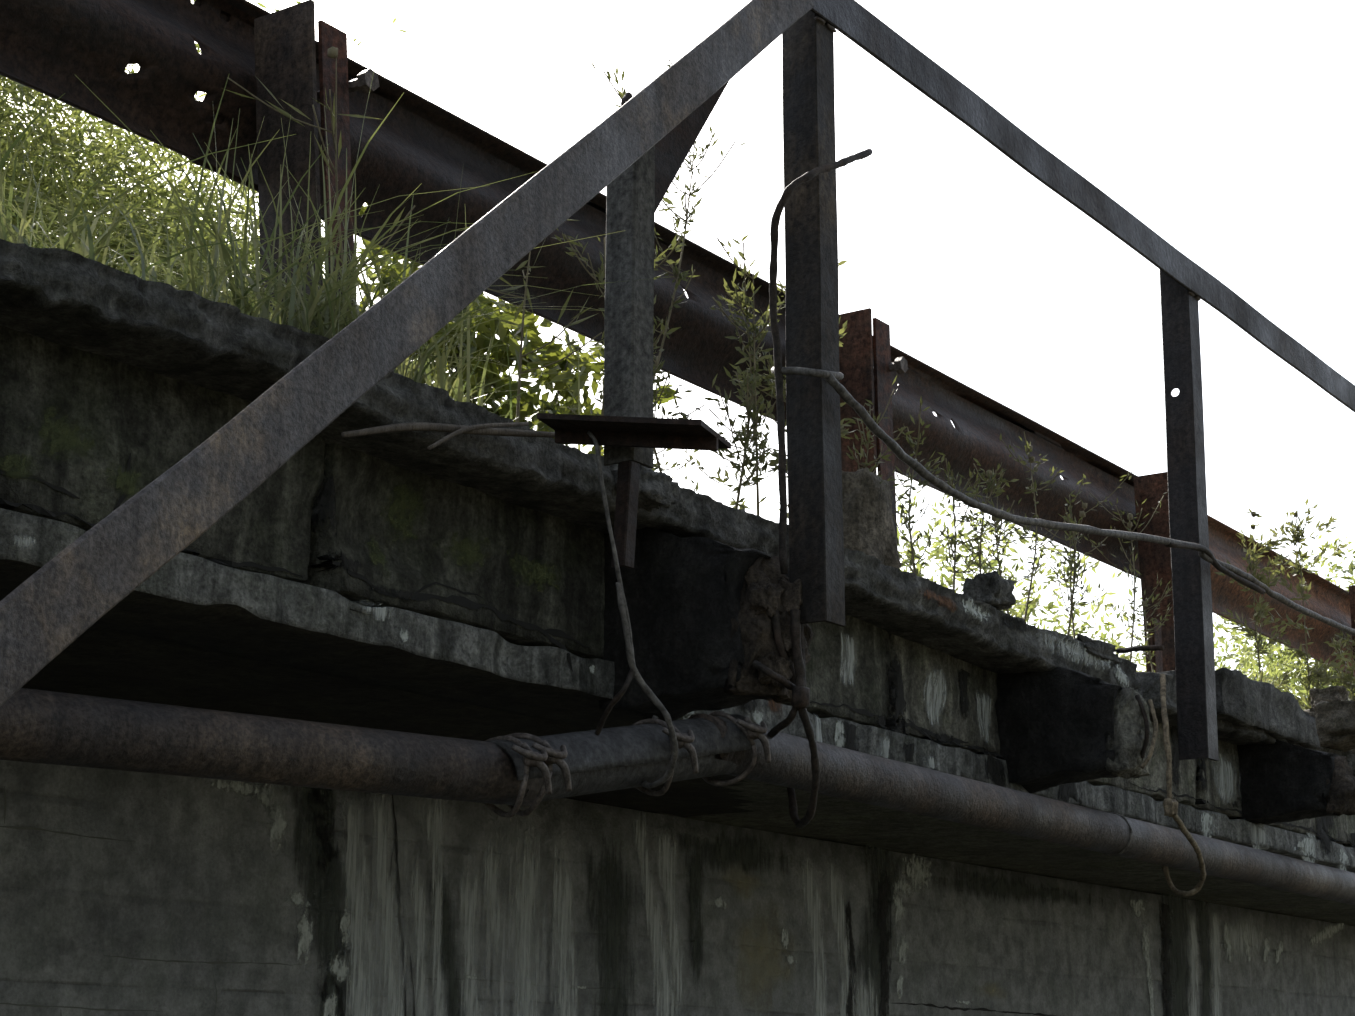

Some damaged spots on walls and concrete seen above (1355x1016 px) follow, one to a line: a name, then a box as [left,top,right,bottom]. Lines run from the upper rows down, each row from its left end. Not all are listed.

damp [293,786,577,1016]
damp [588,817,788,1016]
damp [802,845,900,1016]